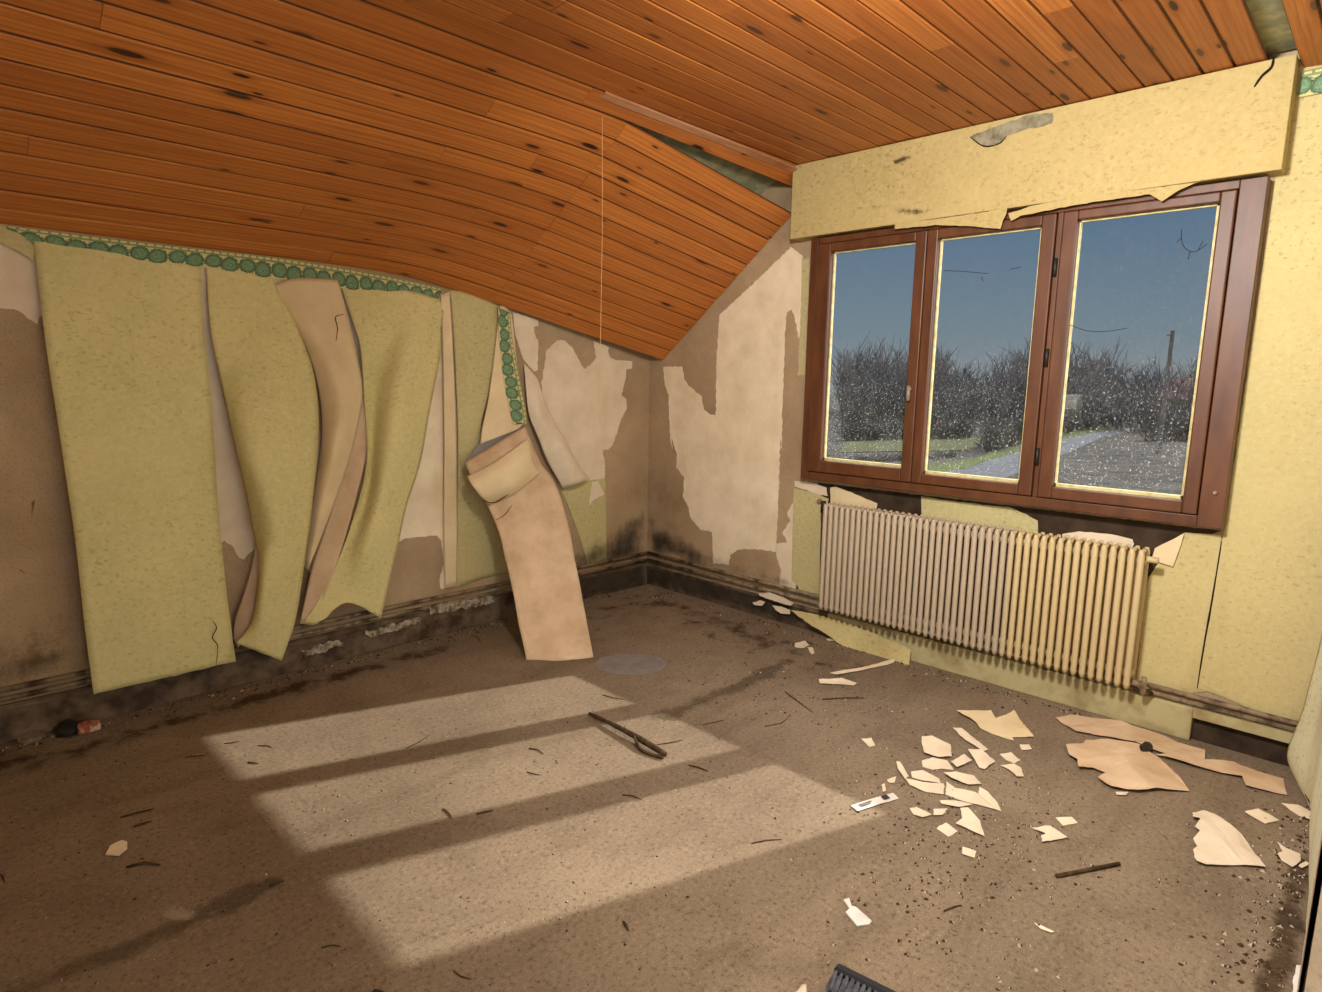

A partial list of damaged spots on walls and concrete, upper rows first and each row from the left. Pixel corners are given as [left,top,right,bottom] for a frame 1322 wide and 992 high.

peeling [970,112,1054,147]
water stain [579,523,796,621]
peeling [365,595,495,638]
peeling [301,640,344,657]